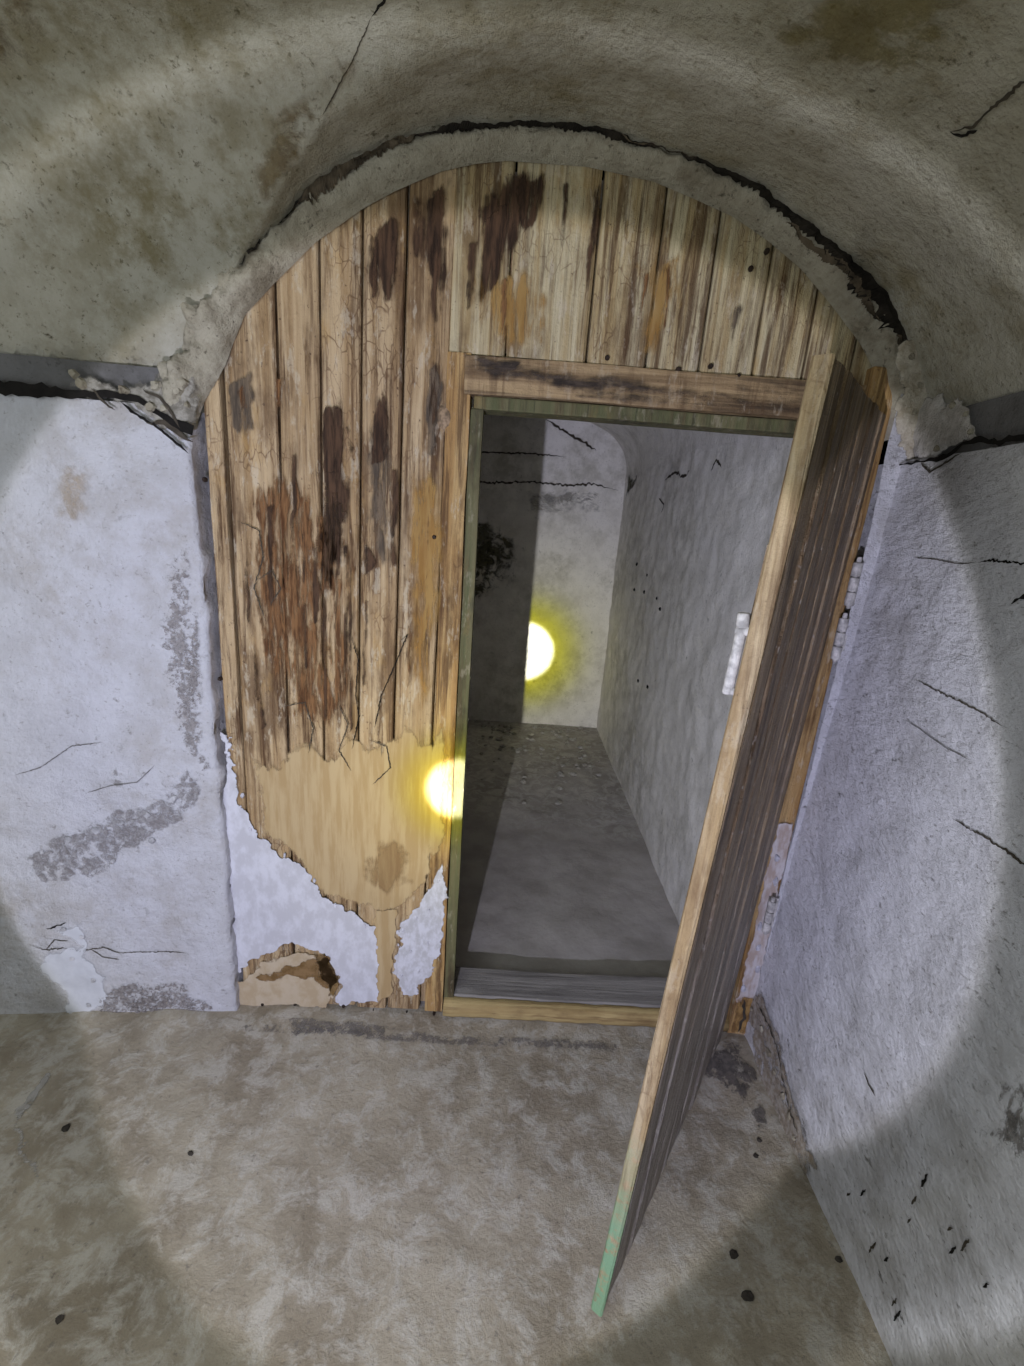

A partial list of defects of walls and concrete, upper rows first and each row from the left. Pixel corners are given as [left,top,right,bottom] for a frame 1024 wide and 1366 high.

crack [323,0,386,114]
crack [354,133,423,160]
crack [616,131,696,157]
crack [951,81,1024,138]
crack [241,196,302,265]
leakage [367,187,448,319]
crack [787,222,902,345]
spalling [68,368,199,440]
crack [899,434,1024,474]
mould [475,523,514,597]
leakage [244,393,445,1001]
peeling [220,733,449,1006]